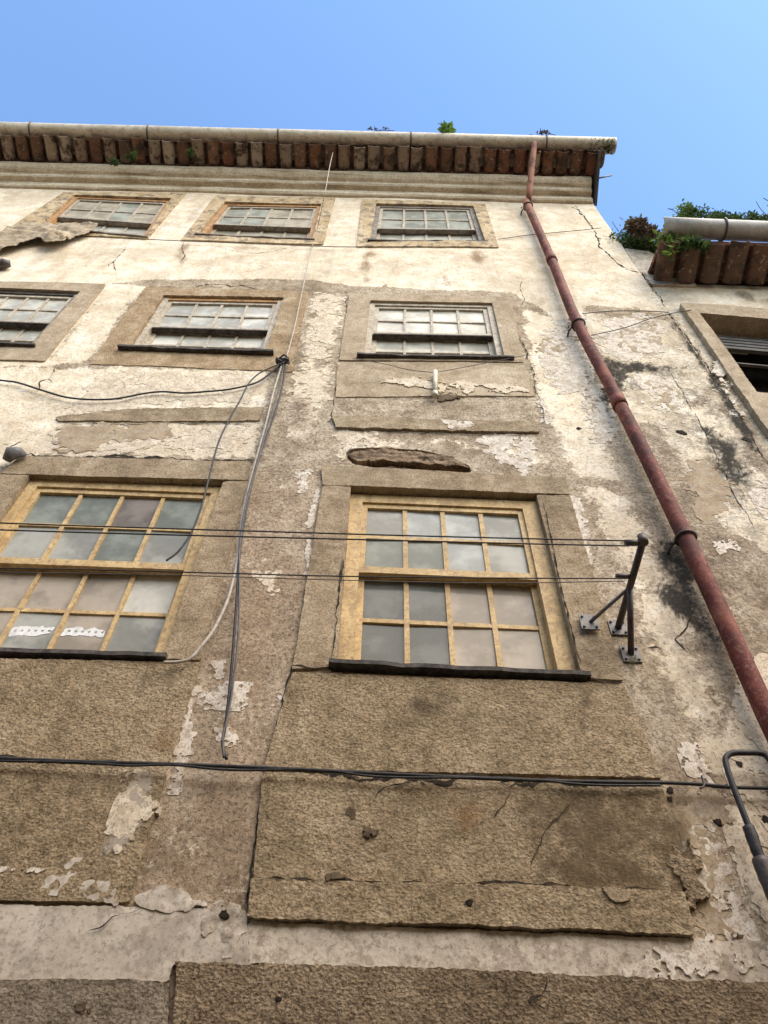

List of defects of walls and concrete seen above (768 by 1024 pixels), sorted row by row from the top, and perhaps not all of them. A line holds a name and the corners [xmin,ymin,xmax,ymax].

peeling [34,369,261,458]
peeling [282,292,349,418]
peeling [441,419,538,476]
crack [573,207,768,463]
water stain [604,314,757,485]
water stain [657,539,722,645]
peeling [101,656,253,855]
crack [246,560,662,906]
peeling [753,653,768,689]
peeling [0,866,45,874]
peeling [622,681,768,982]